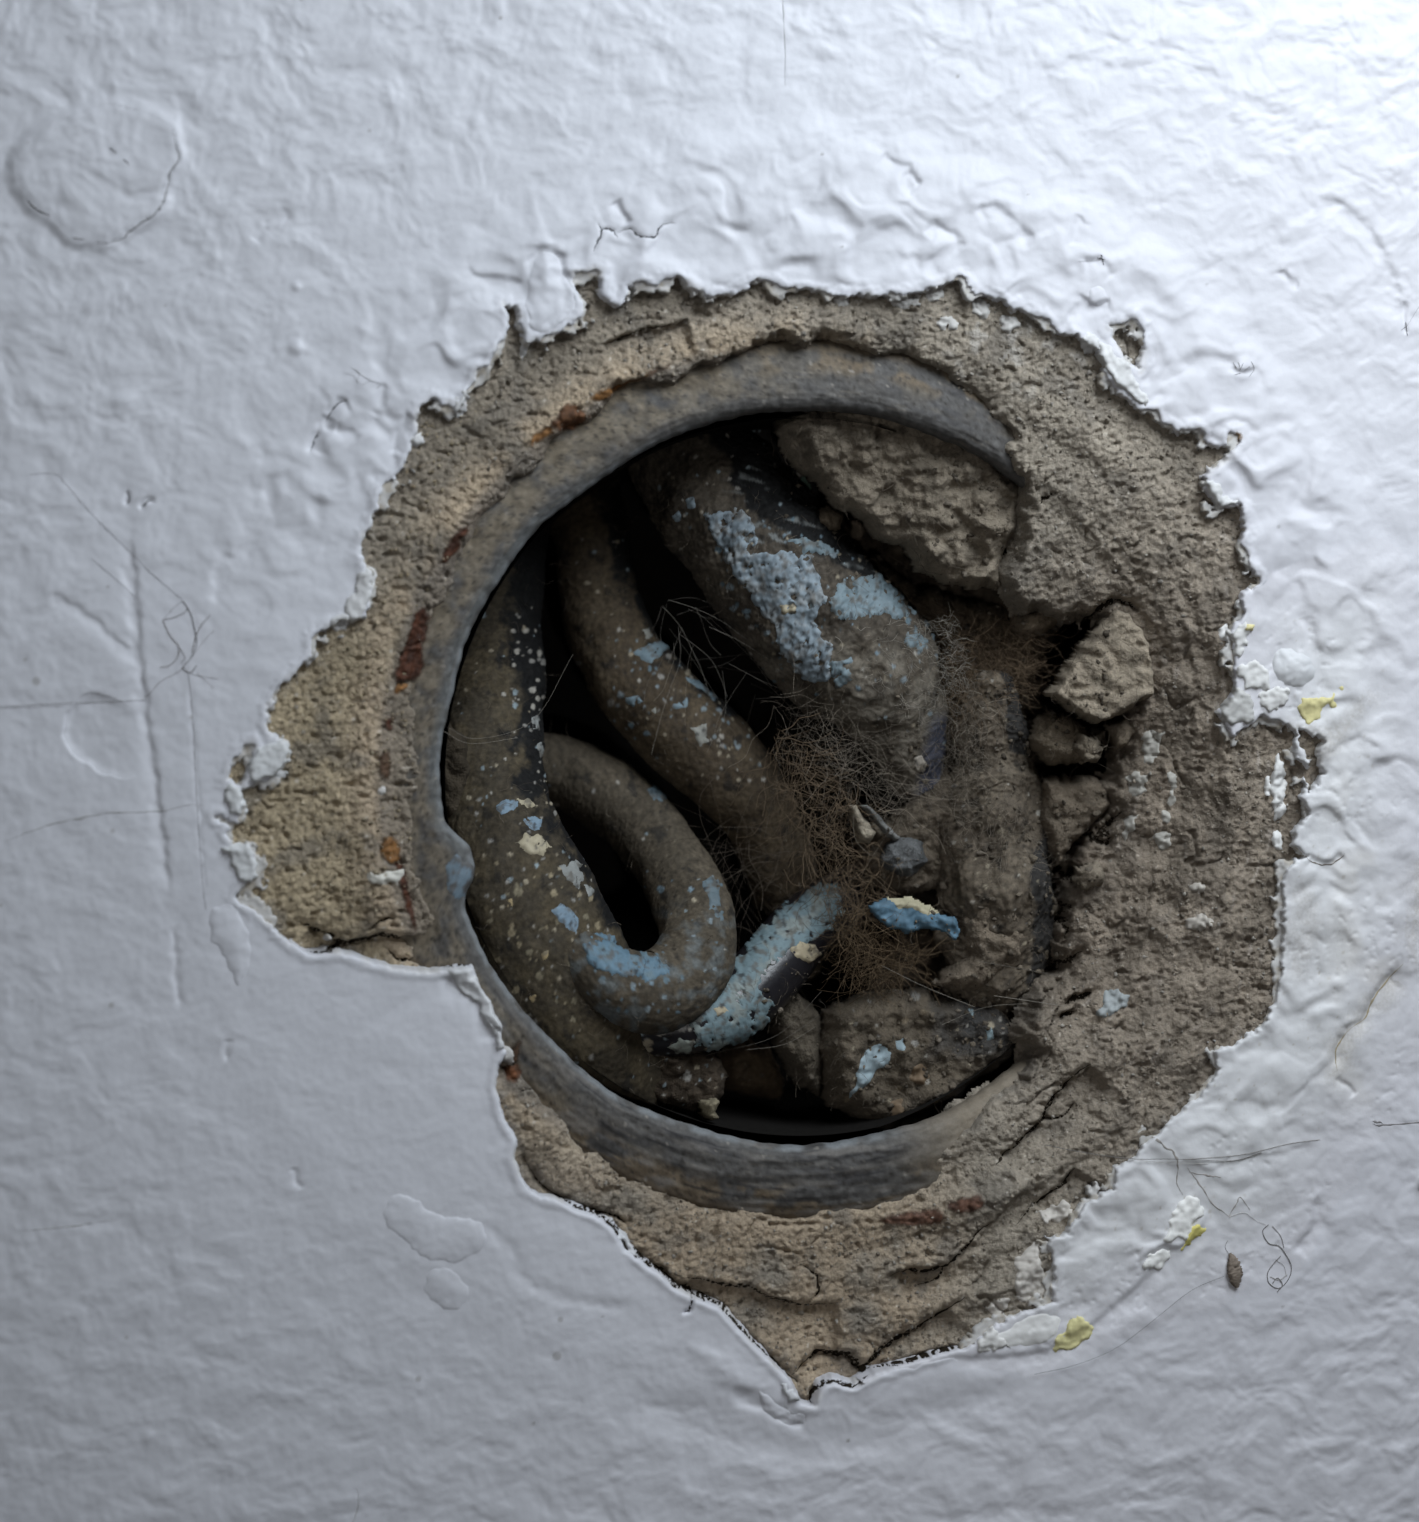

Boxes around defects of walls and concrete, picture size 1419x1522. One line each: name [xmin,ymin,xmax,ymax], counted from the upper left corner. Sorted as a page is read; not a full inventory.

corrosion [531,365,670,443]
corrosion [395,608,430,693]
spalling [221,278,1419,1403]
crack [996,1064,1091,1164]
corrosion [880,1195,984,1226]
crack [523,1156,1075,1403]